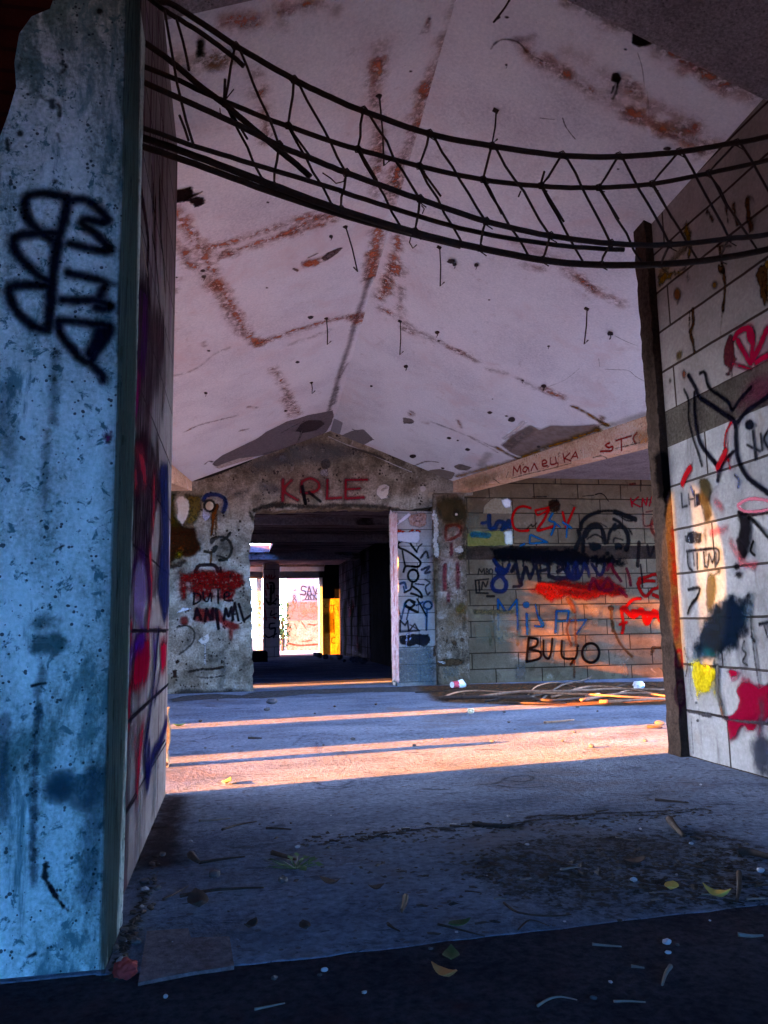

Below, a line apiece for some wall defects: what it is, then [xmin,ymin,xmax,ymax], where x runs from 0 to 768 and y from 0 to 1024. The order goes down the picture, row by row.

rust [418,74,434,105]
rust [624,108,703,152]
rust [177,209,365,347]
rust [364,228,402,314]
spalling [205,411,374,468]